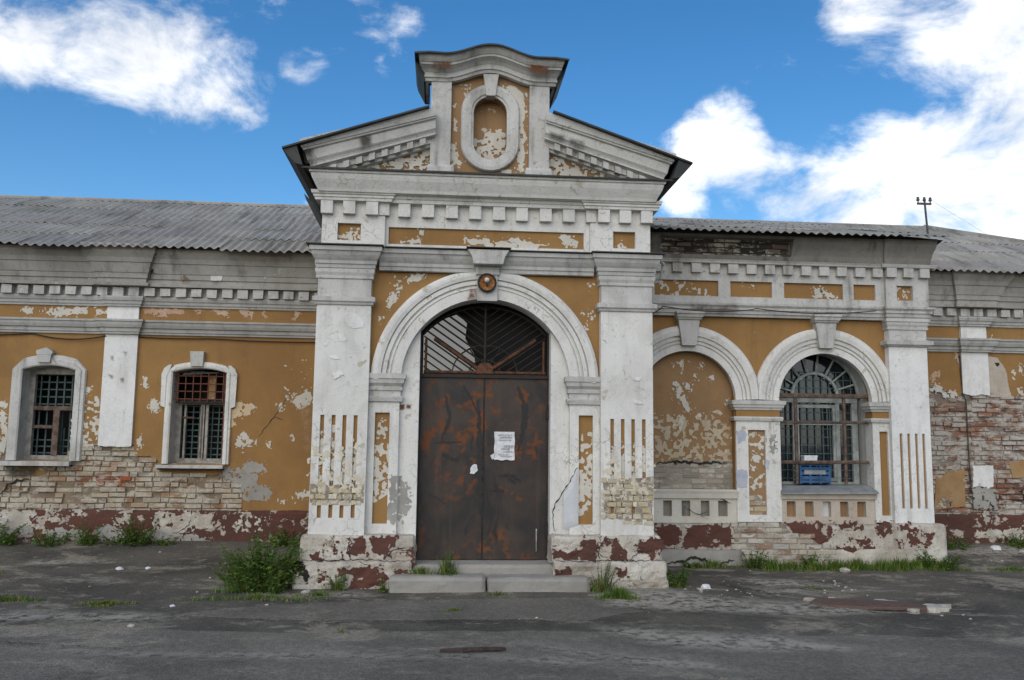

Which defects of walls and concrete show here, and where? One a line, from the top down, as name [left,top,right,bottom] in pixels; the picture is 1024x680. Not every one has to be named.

peeling [473,129,506,159]
peeling [463,234,579,248]
peeling [20,306,108,318]
peeling [142,308,268,320]
peeling [140,376,160,414]
crack [657,459,727,467]
flaking render [552,362,935,578]
flaking render [929,356,1024,541]
flaking render [0,385,417,589]